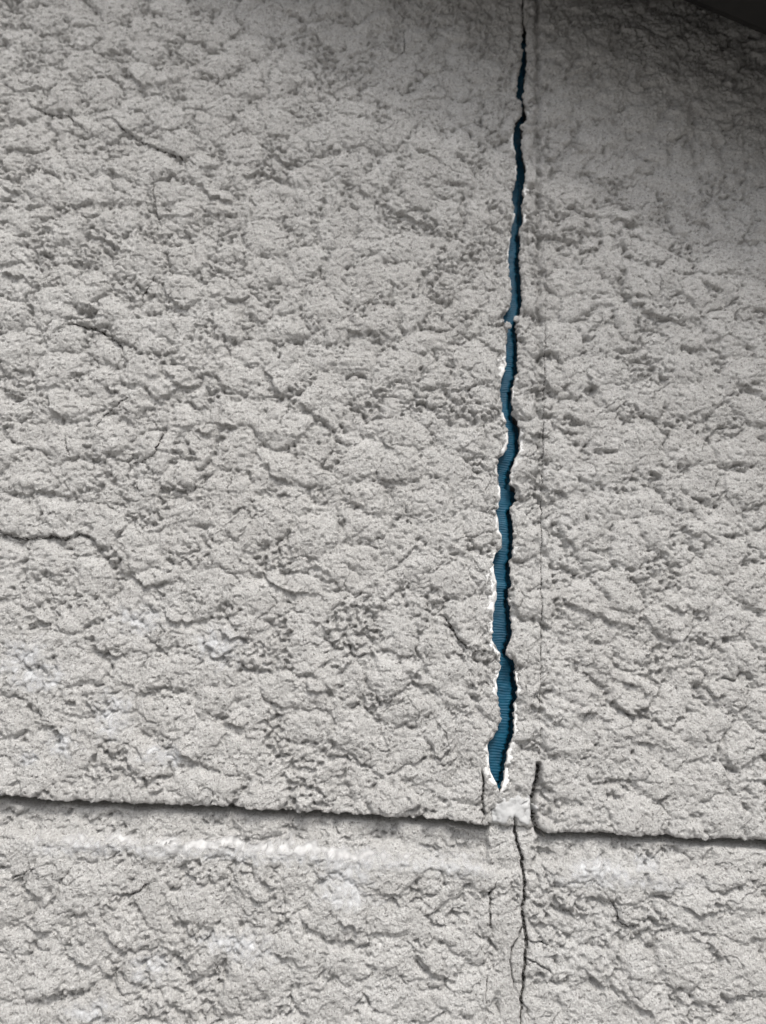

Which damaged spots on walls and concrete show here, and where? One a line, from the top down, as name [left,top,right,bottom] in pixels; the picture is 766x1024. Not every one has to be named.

crack [444,0,551,1024]